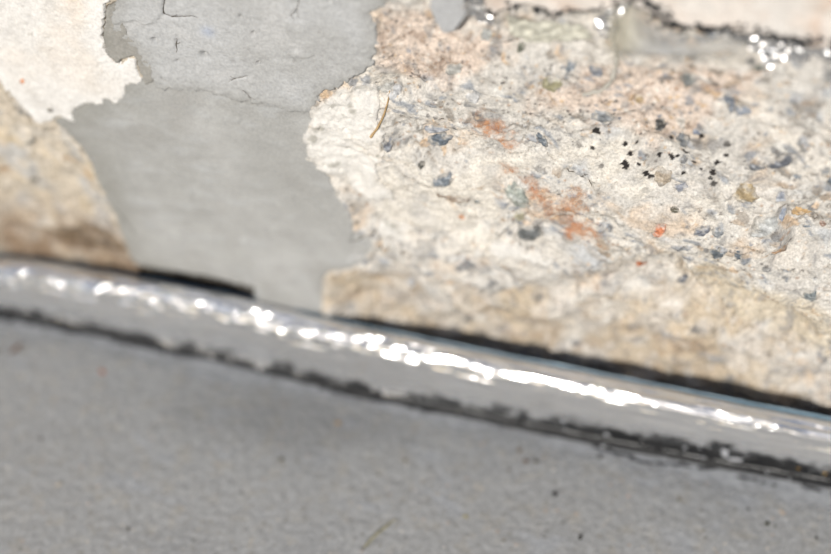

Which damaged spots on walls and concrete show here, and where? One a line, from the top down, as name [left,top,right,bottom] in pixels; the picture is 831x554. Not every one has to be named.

spalling [0,0,255,298]
spalling [302,0,831,417]